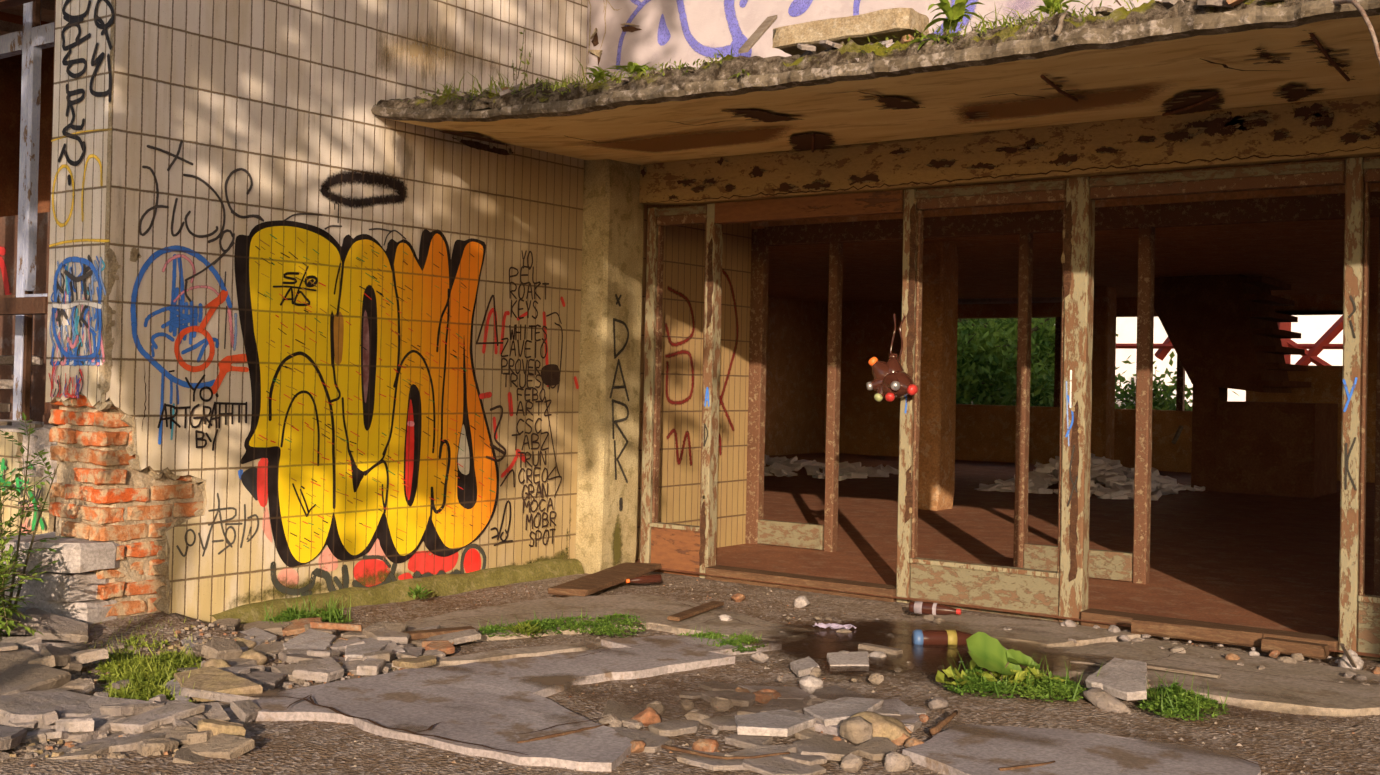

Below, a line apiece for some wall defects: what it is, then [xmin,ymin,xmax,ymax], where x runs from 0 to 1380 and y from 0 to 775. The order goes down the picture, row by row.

damp [386,38,481,67]
damp [957,86,1162,123]
spalling [21,248,205,618]